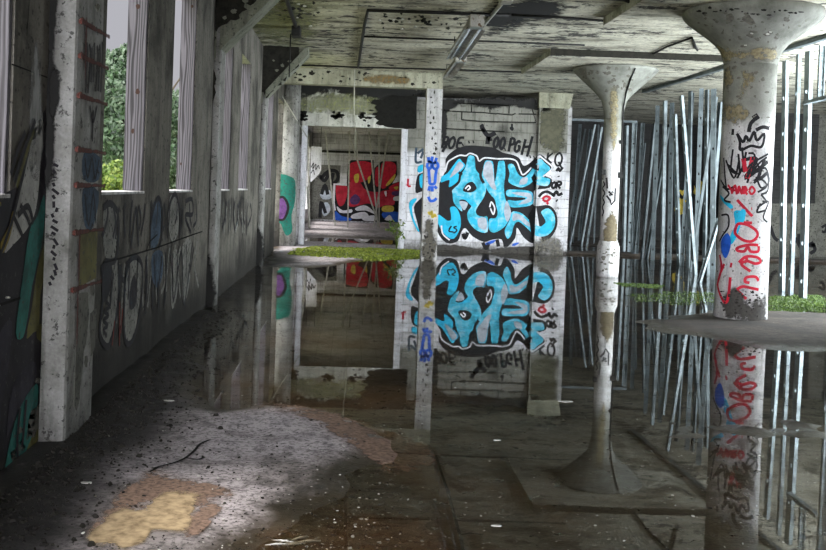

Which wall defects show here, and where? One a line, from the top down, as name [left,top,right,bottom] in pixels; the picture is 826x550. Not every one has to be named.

rust [78,17,110,80]
peeling [214,0,257,41]
water stain [486,0,565,33]
peeling [696,6,806,103]
peeling [358,95,418,129]
rust [70,227,104,348]